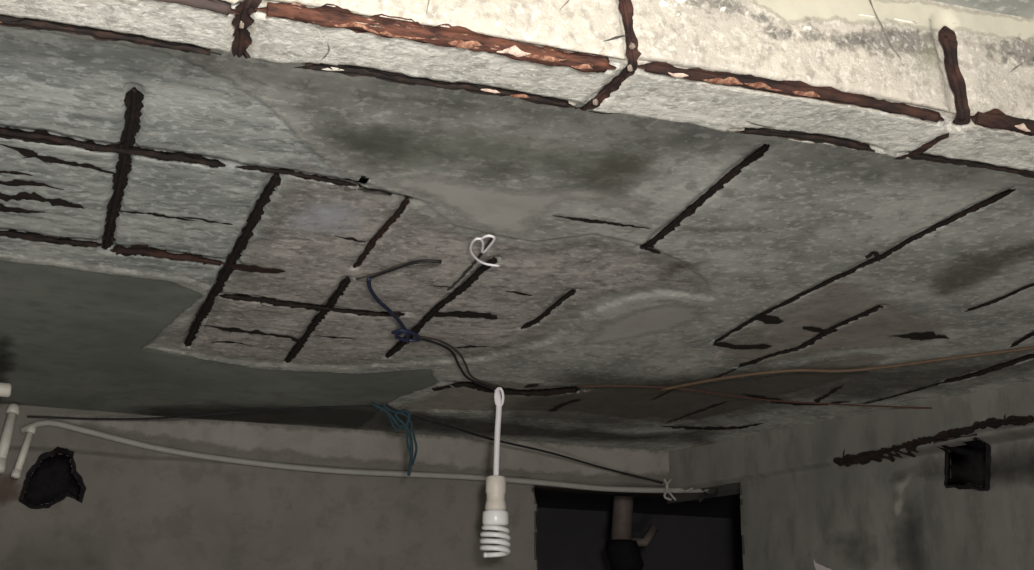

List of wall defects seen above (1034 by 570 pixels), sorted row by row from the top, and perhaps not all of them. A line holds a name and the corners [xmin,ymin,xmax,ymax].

leakage [333,132,637,175]
spalling [0,0,1034,378]
spalling [401,381,588,412]
spalling [862,331,1034,404]